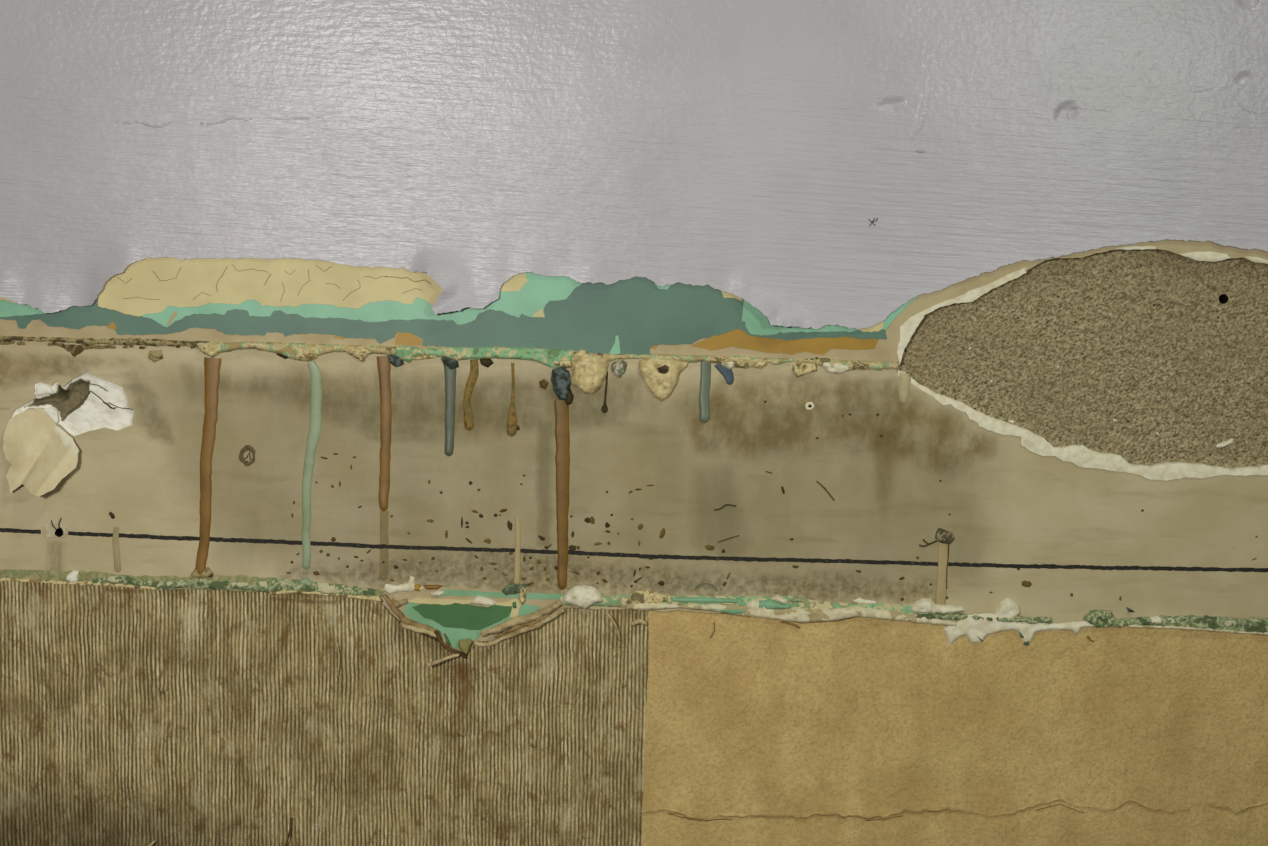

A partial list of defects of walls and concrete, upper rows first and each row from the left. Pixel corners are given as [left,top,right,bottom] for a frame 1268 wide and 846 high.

flaking render [0,246,1268,497]
peeling [470,596,496,606]
crack [668,813,732,821]